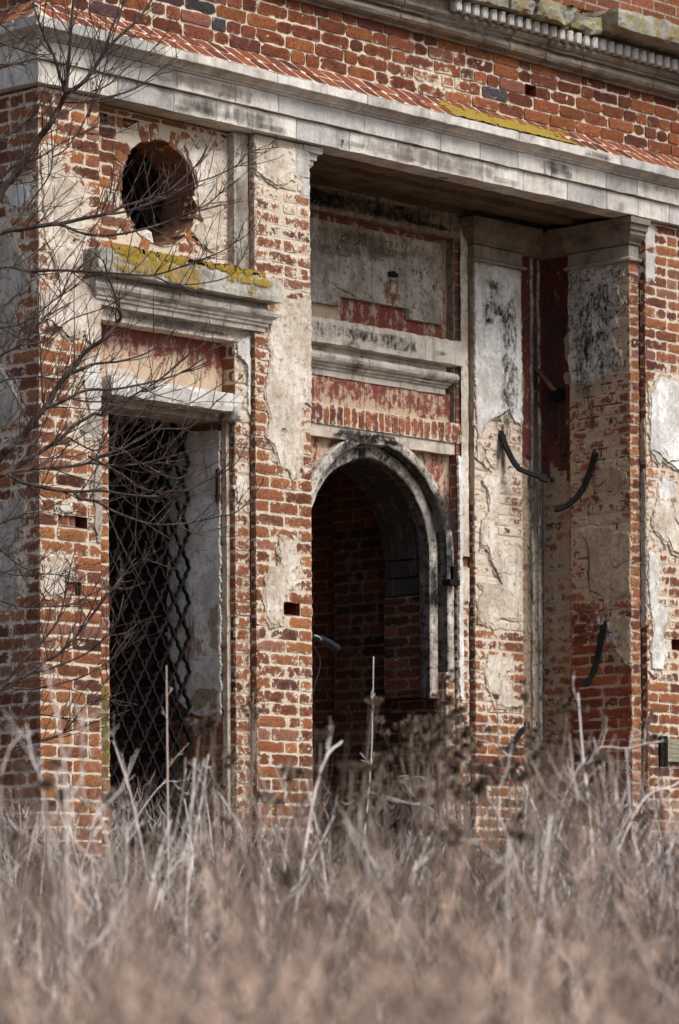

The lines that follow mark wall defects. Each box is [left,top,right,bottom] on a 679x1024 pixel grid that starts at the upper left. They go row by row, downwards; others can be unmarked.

flaking render [184,142,224,252]
flaking render [254,143,298,189]
water stain [147,268,201,289]
flaking render [263,295,313,480]
flaking render [456,261,524,701]
water stain [483,279,616,595]
flaking render [580,373,679,675]
flaking render [261,534,305,629]
flaking render [483,654,524,711]